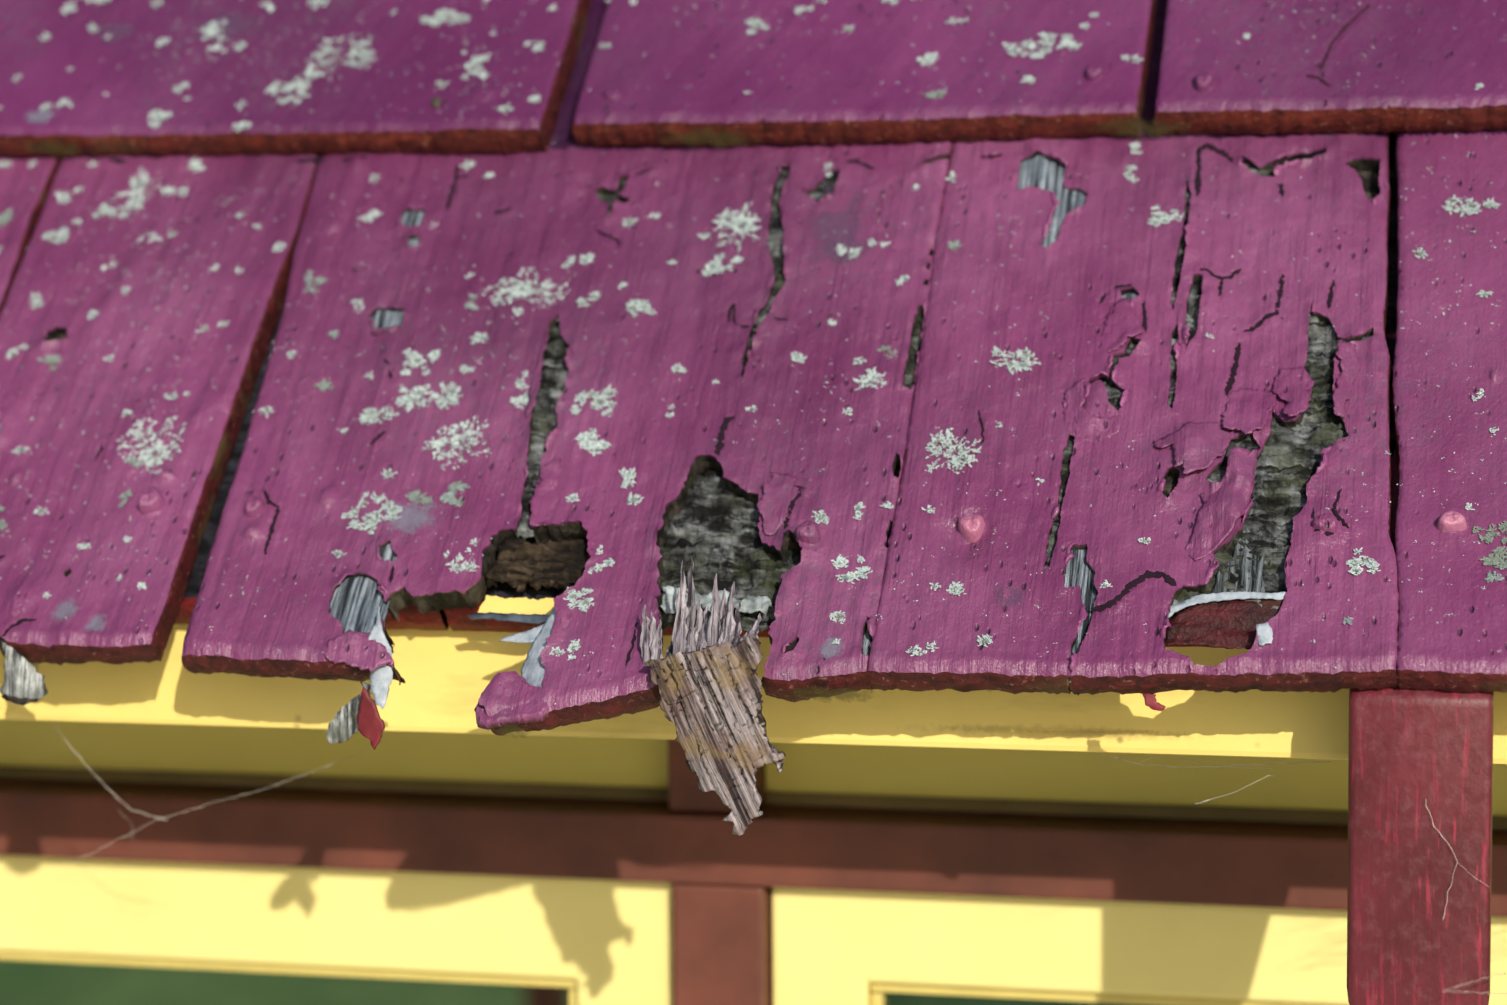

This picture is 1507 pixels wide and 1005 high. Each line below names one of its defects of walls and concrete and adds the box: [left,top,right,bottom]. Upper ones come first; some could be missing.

peeling [1017,152,1087,248]
crack [728,303,788,328]
peeling [1084,291,1142,407]
peeling [1332,340,1360,418]
peeling [376,544,397,562]
peeling [756,472,798,536]
peeling [1153,366,1315,650]
peeling [1315,446,1332,474]
peeling [1064,543,1098,683]
peeling [0,642,48,705]
peeling [324,573,394,750]
peeling [474,608,556,730]